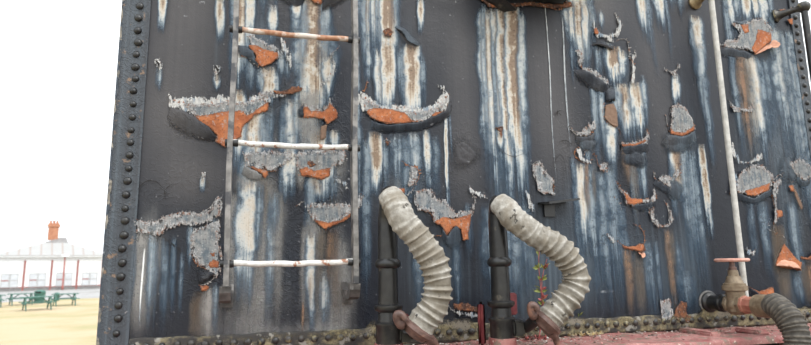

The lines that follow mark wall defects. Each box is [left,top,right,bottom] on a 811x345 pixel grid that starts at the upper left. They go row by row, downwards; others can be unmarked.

peeling [133,196,223,291]
peeling [167,65,303,147]
leakage [230,0,346,326]
leakage [358,0,426,111]
leakage [357,103,452,267]
peeling [358,82,452,146]
peeling [399,161,485,247]
leakage [636,0,683,41]
leakage [668,15,714,253]
peeling [720,18,780,60]
leakage [723,0,811,167]
peeling [732,142,811,271]